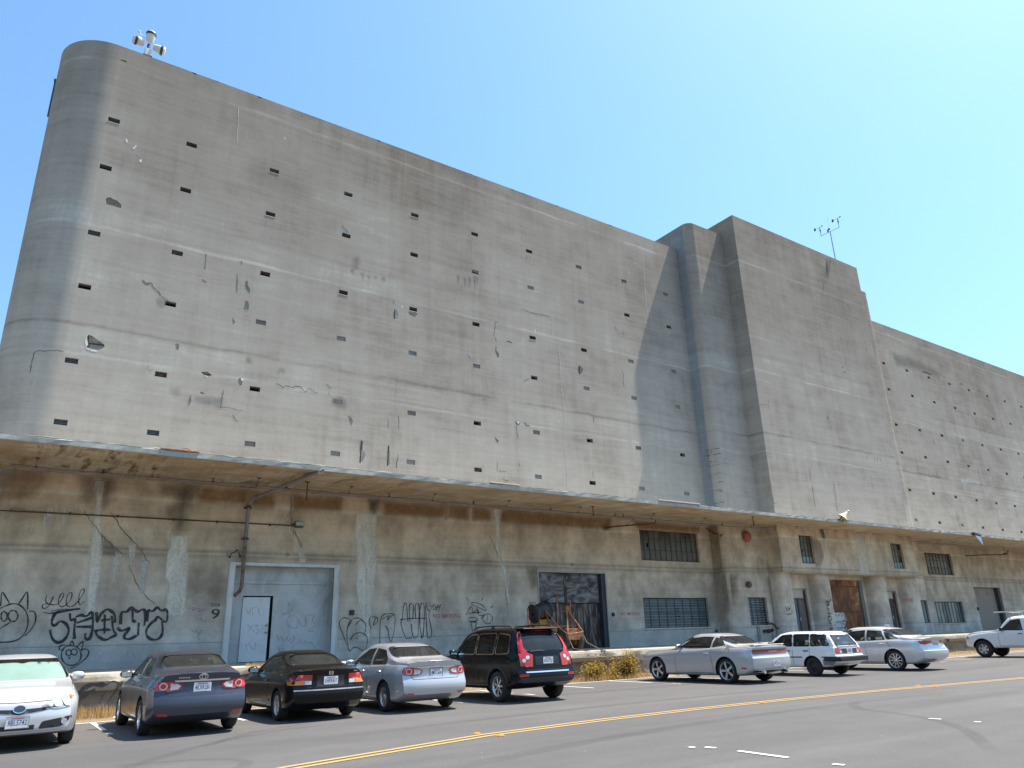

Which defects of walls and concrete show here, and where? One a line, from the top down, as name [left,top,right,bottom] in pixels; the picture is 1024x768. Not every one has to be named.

spalling [85,335,104,352]
crack [84,510,154,603]